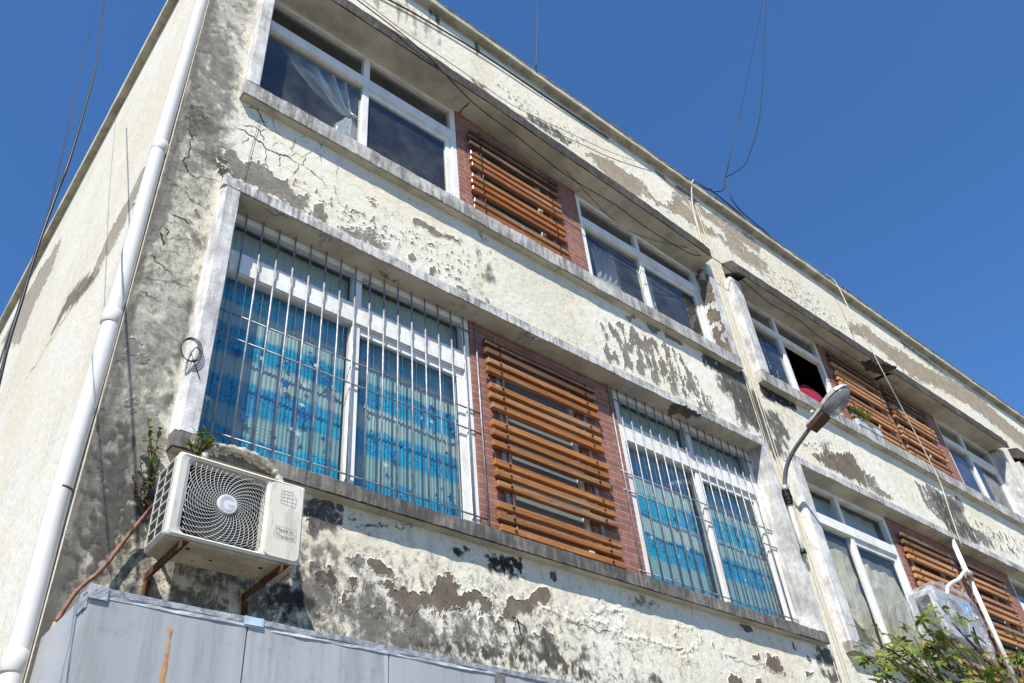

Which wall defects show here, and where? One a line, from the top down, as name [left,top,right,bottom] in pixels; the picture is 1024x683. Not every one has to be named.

damp [138,24,237,277]
crack [139,106,339,301]
peeling [182,103,480,293]
peeling [492,79,1024,450]
peeling [303,496,345,530]
peeling [308,552,558,657]
peeling [802,441,893,501]